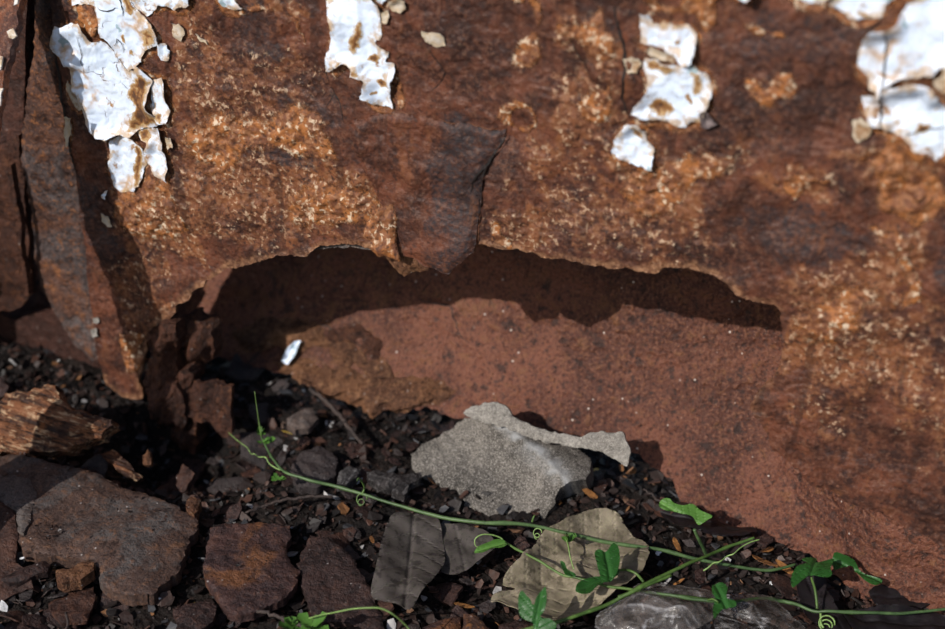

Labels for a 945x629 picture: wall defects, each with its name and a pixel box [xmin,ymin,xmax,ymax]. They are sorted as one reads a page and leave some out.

corrosion [76,4,98,37]
peeling [49,0,208,200]
corrosion [182,100,336,178]
corrosion [288,178,430,277]
peeling [325,0,507,274]
corrosion [556,7,616,61]
peeling [610,12,718,173]
corrosion [620,152,734,217]
peeling [792,0,945,167]
peeling [281,340,301,365]
corrosion [231,316,456,419]
peeling [463,402,631,467]